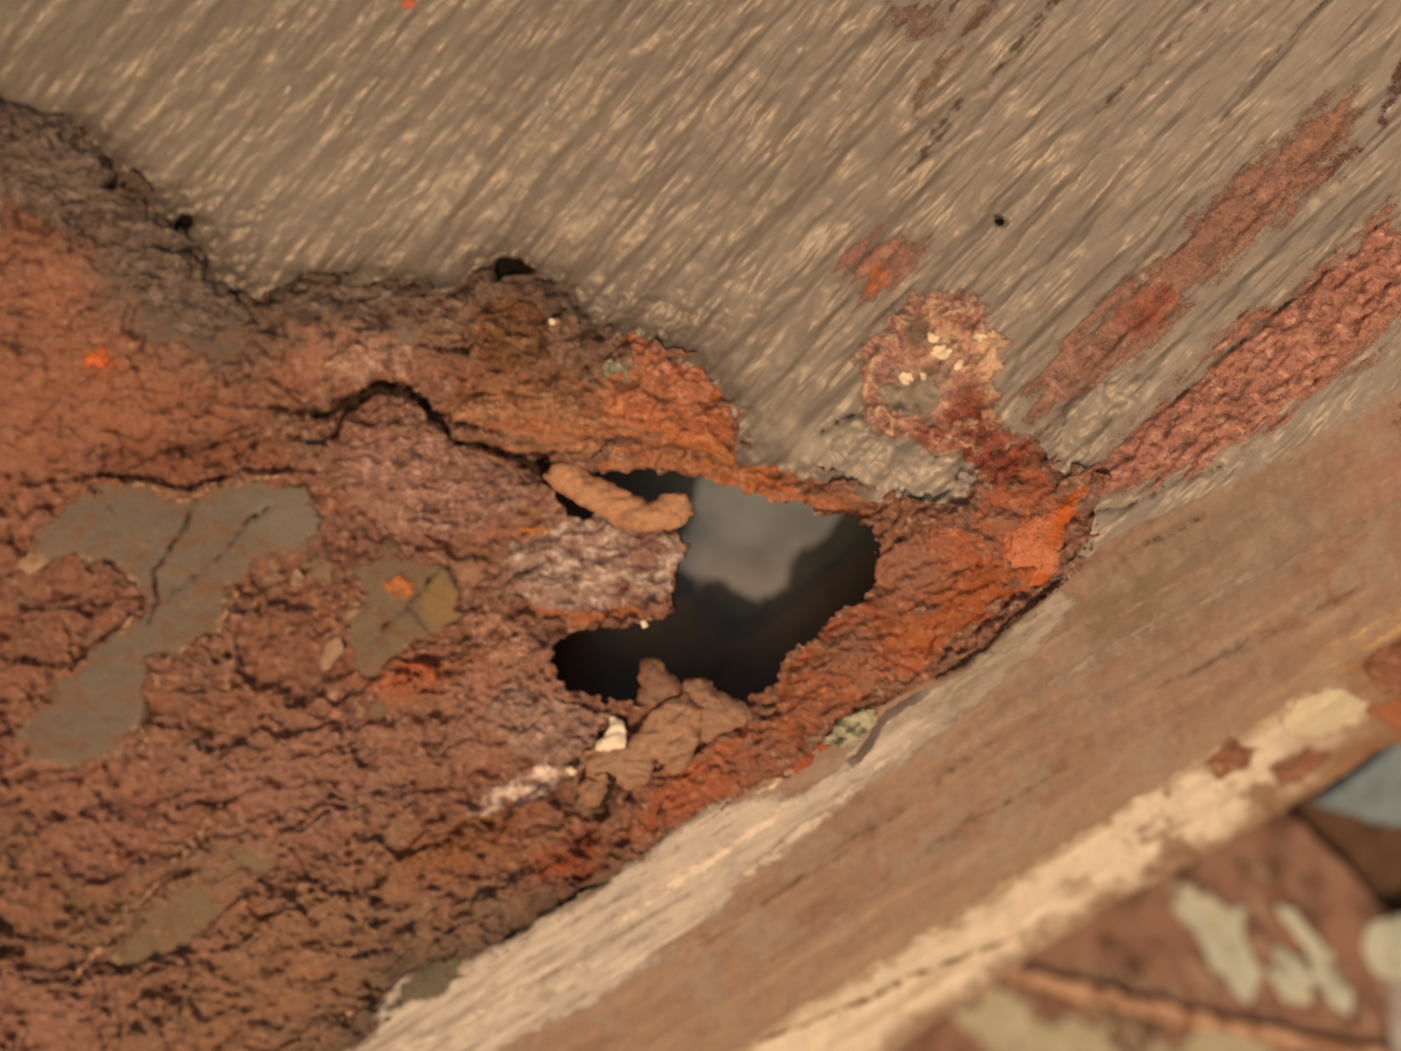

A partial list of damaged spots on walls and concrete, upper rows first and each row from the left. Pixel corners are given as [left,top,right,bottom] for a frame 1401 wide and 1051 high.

spalling [174,215,193,234]
spalling [494,258,535,282]
crack [310,380,542,475]
peeling [603,358,640,388]
rust [805,93,1401,715]
peeling [543,463,695,533]
rust [0,96,880,1051]
peeling [566,656,777,808]